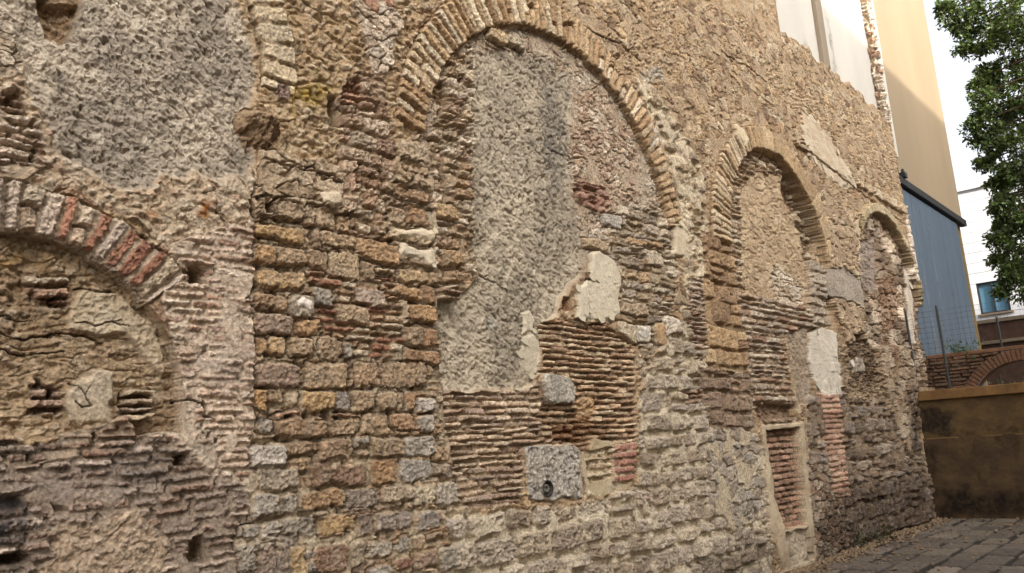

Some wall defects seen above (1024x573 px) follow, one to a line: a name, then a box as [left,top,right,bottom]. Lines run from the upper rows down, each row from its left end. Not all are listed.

crack [0,287,131,358]
flaking render [574,251,622,324]